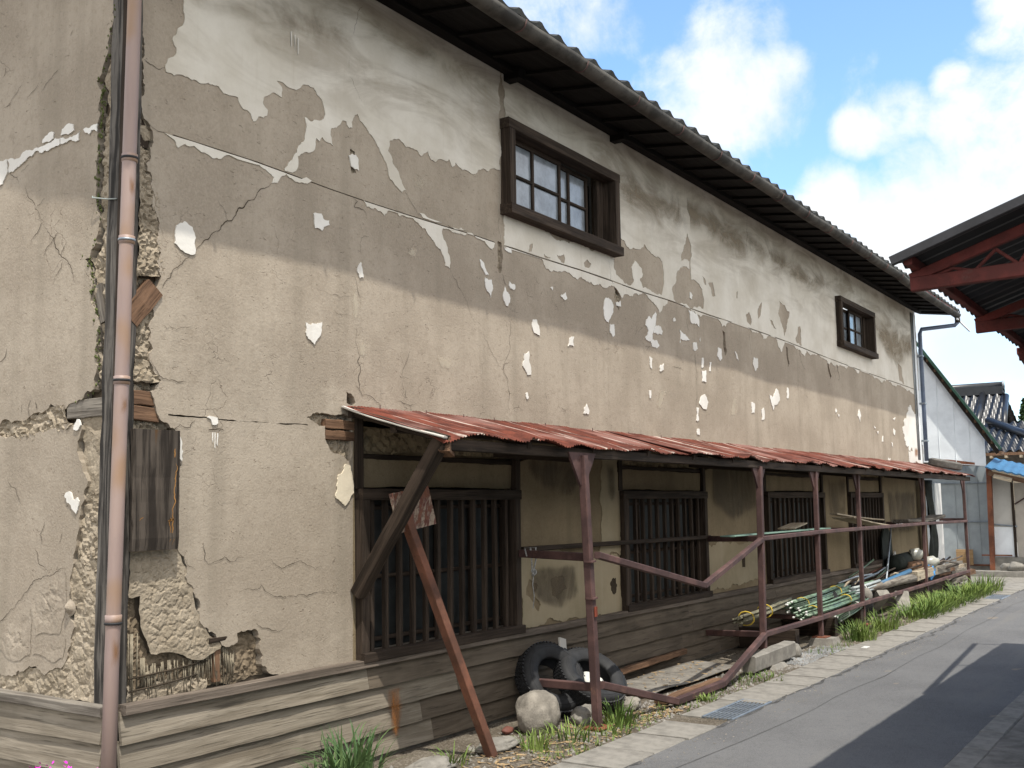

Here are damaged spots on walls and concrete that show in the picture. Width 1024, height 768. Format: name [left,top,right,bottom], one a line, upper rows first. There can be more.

crack [10,171,73,285]
spalling [0,60,111,298]
spalling [136,120,165,289]
peeling [165,0,924,464]
leakage [623,185,752,251]
spalling [133,311,160,391]
leakage [879,329,911,358]
spalling [133,420,168,430]
peeling [307,413,354,506]